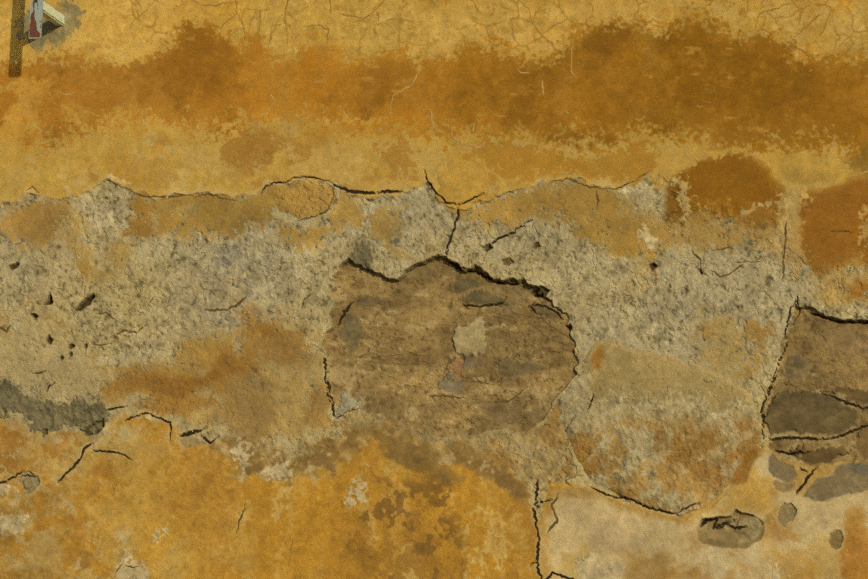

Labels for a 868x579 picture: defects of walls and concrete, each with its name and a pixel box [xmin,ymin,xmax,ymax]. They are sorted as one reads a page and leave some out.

corrosion [29,0,41,37]
damp [0,17,868,278]
crack [692,223,787,282]
flaking render [0,174,868,518]
crack [323,357,360,418]
crack [760,297,868,494]
crack [0,471,35,484]
crack [58,444,129,481]
crack [531,476,576,579]
crack [593,488,746,530]
spalling [698,511,765,549]
spalling [778,503,797,527]